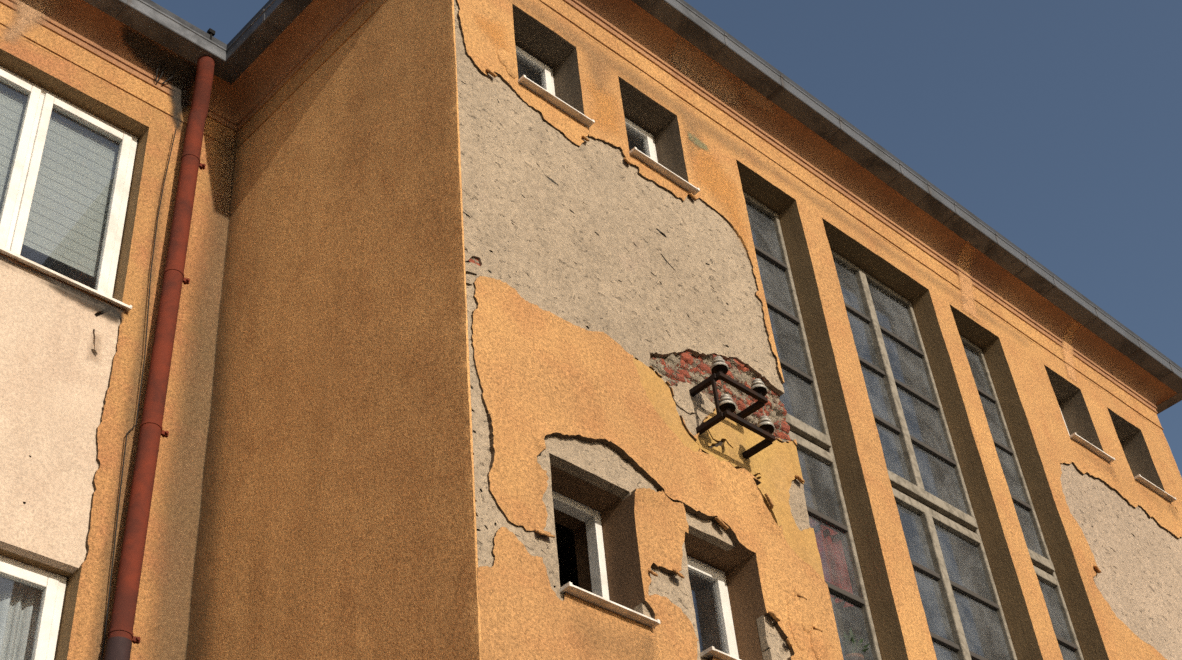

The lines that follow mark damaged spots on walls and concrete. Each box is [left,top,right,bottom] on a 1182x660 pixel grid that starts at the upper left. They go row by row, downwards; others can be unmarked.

leakage [123,28,197,128]
peeling [0,256,120,573]
peeling [454,0,825,601]
peeling [1060,463,1182,660]